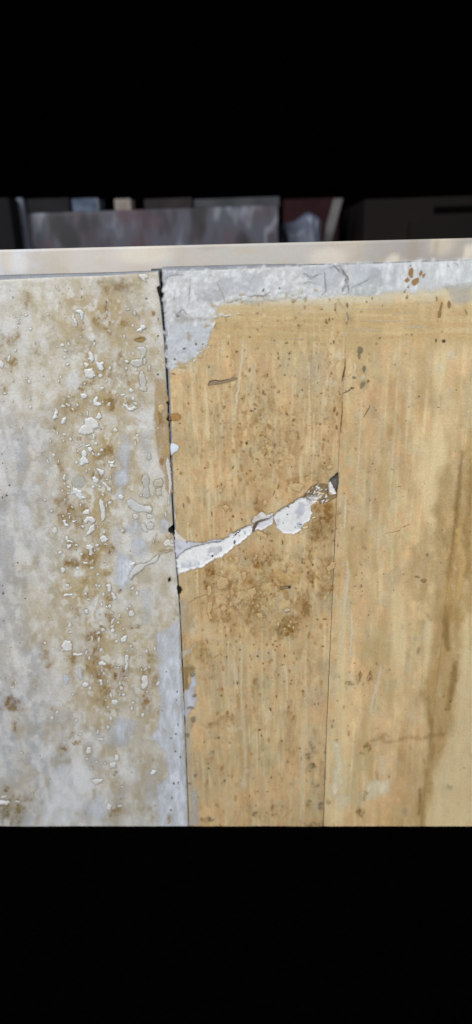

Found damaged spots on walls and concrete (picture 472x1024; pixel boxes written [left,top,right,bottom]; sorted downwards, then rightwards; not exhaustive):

damp [152,623,187,826]
peeling [44,259,472,785]